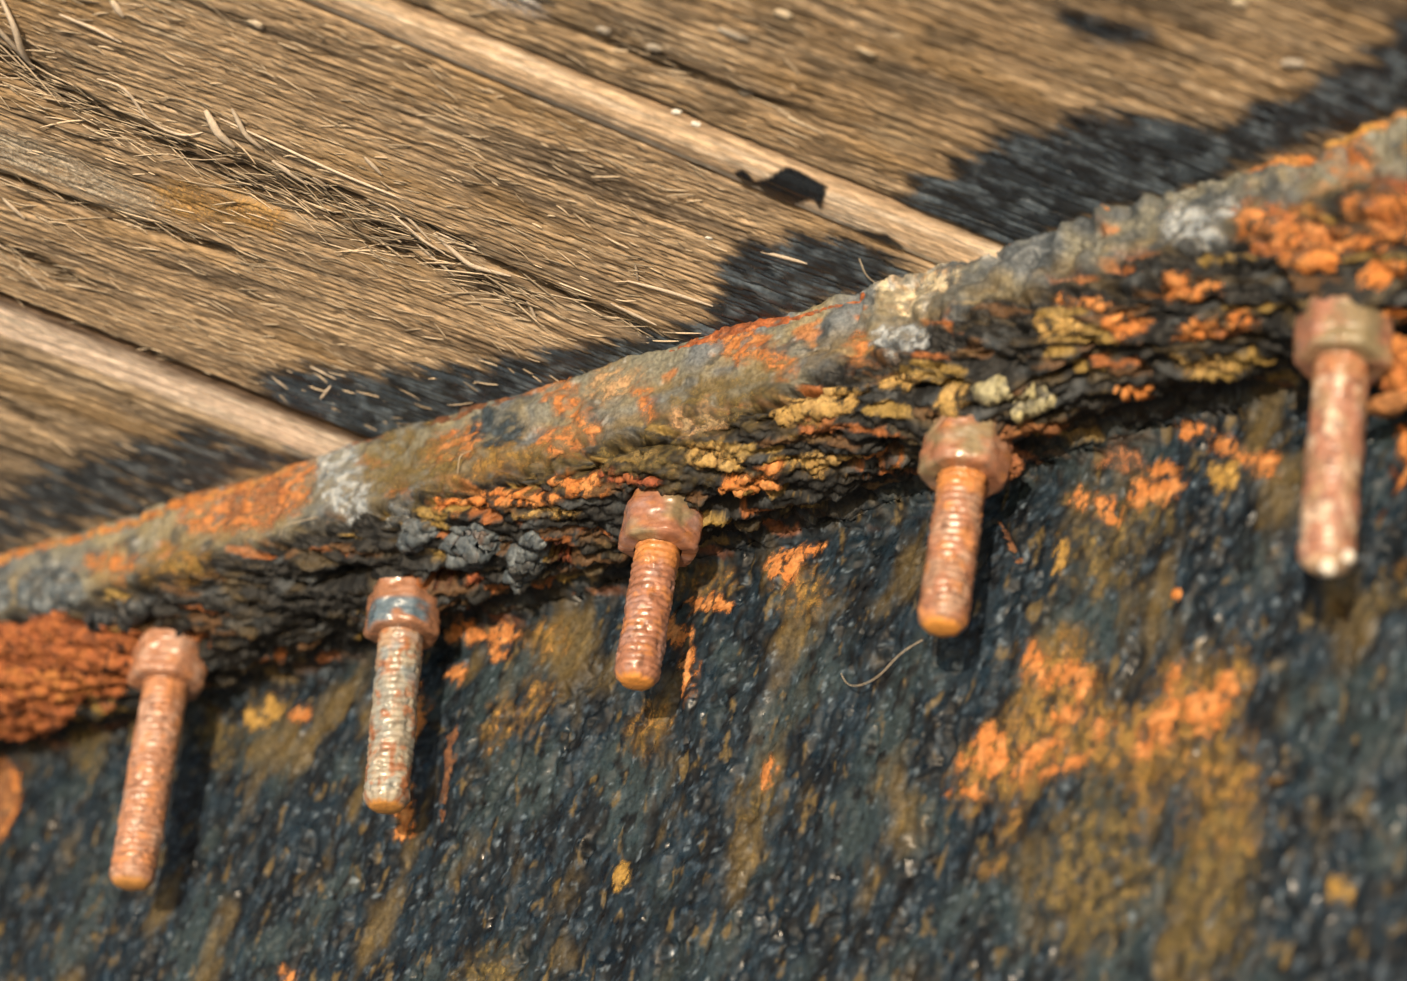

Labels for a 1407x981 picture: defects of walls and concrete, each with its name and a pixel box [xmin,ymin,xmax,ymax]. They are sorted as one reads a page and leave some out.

rust [1237,111,1407,320]
rust [344,292,922,520]
rust [934,379,969,419]
rust [0,461,317,585]
rust [0,610,142,841]
rust [244,694,311,733]
rust [394,784,415,841]
rust [415,681,426,740]
rust [439,724,458,823]
rust [483,681,543,751]
rust [946,625,1256,972]